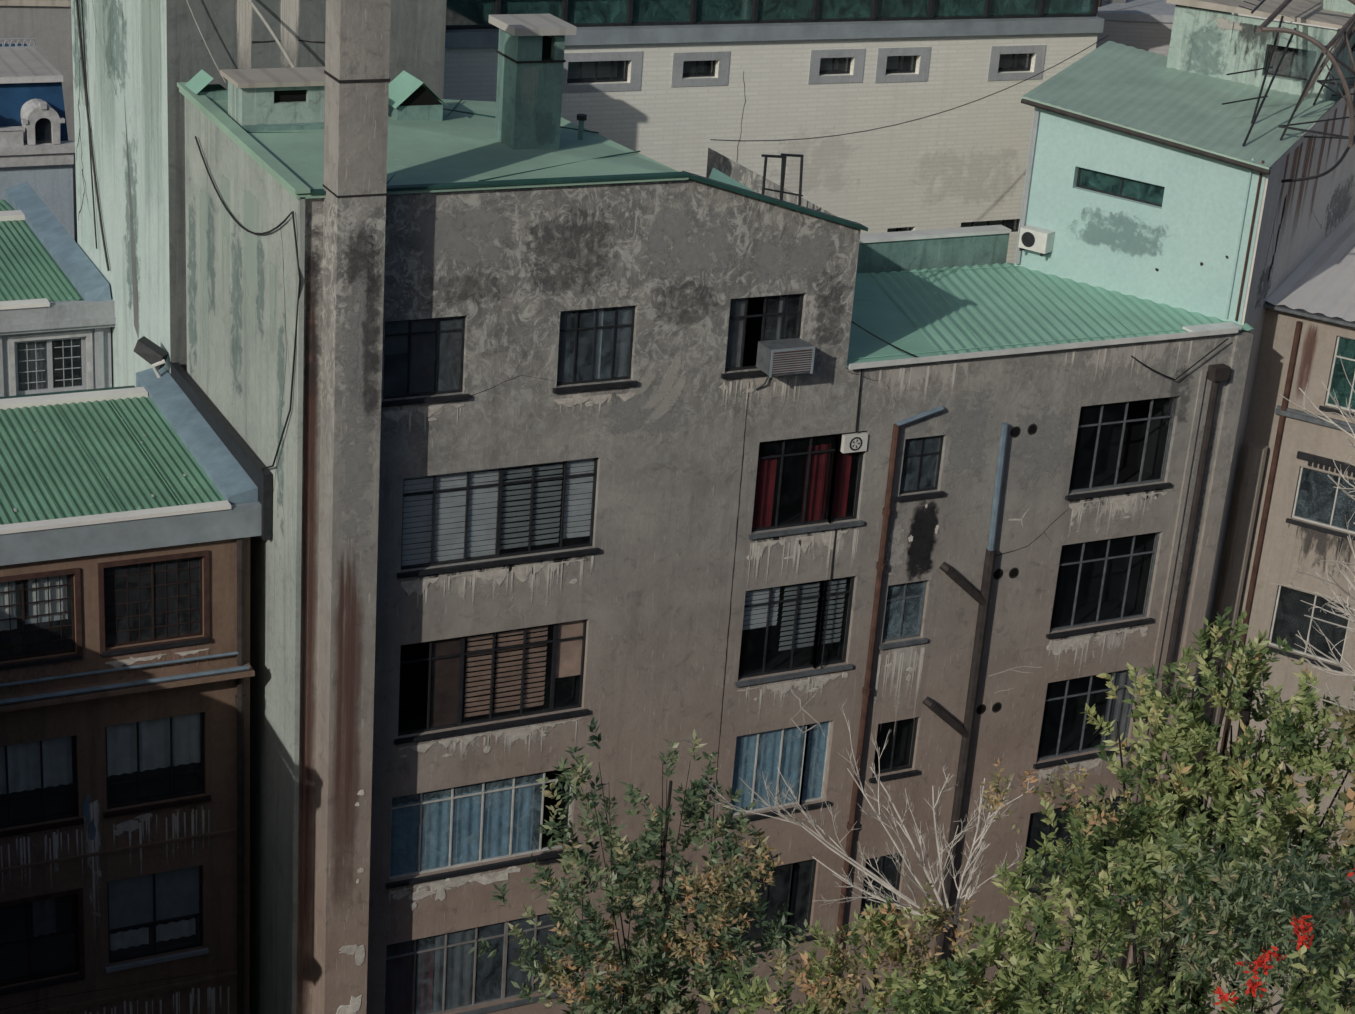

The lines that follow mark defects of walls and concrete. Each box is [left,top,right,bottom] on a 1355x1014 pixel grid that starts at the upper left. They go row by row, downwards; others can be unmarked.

damp [124,97,138,336]
rust [335,570,360,885]
damp [83,800,102,908]